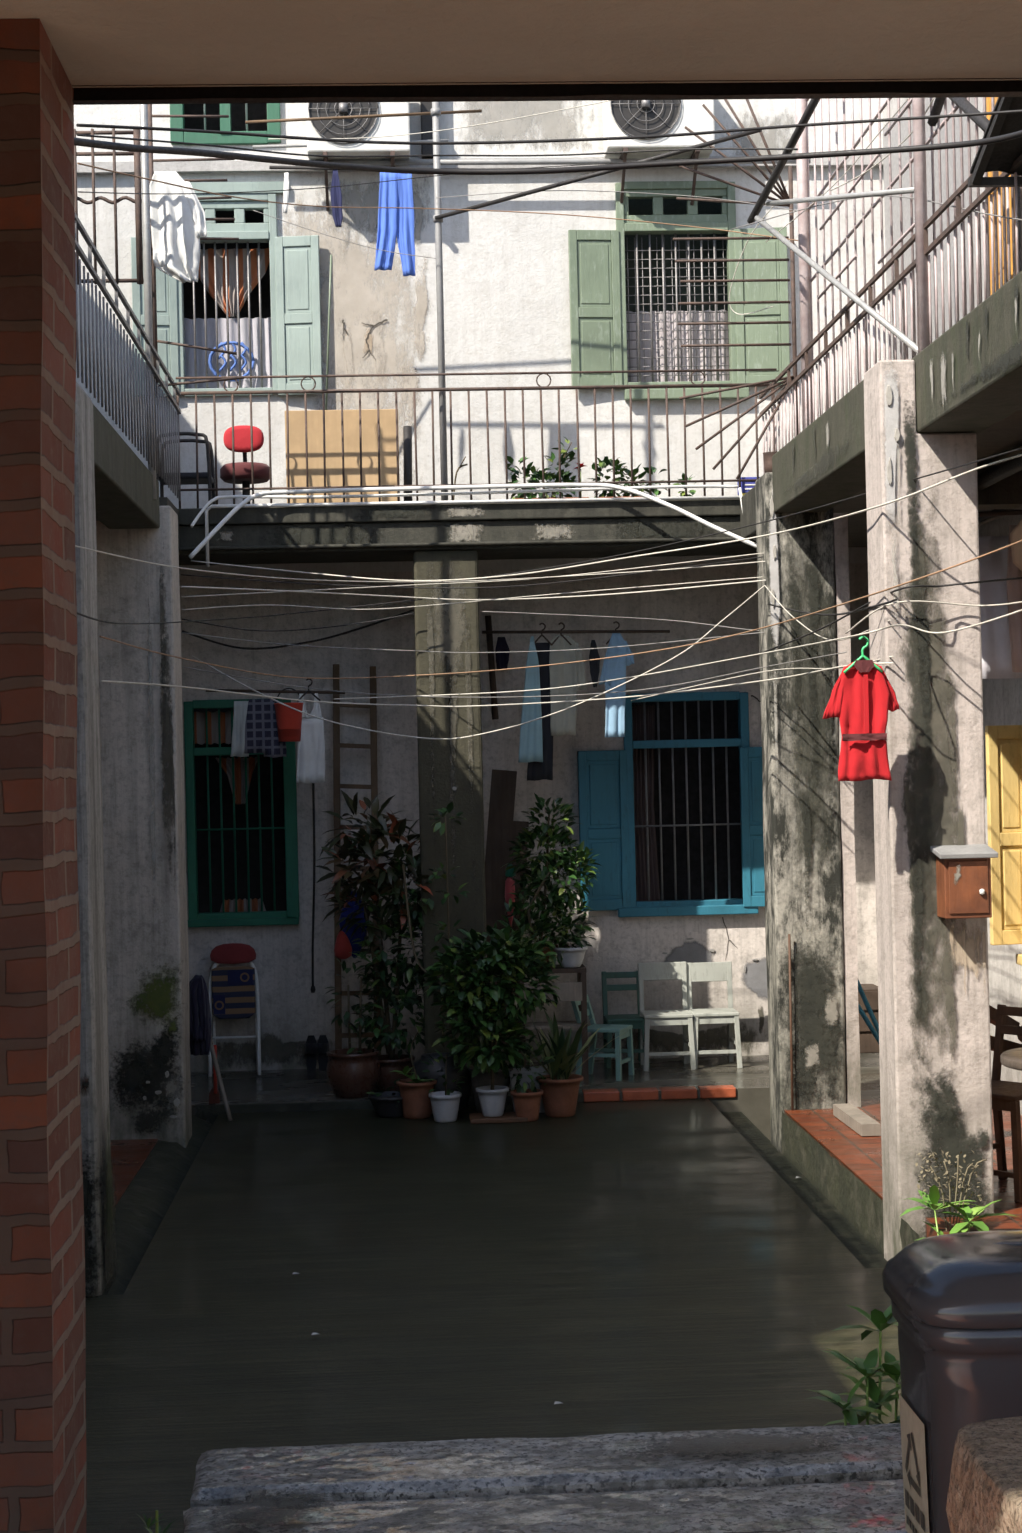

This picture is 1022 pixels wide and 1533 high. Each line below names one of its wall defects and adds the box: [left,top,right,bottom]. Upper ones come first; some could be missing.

water stain [930,288,1022,404]
water stain [785,549,834,905]
water stain [900,400,989,1238]
mould [110,1029,183,1133]
water stain [598,1007,764,1056]
spalling [662,938,715,963]
spalling [743,958,768,999]
water stain [783,925,844,1110]